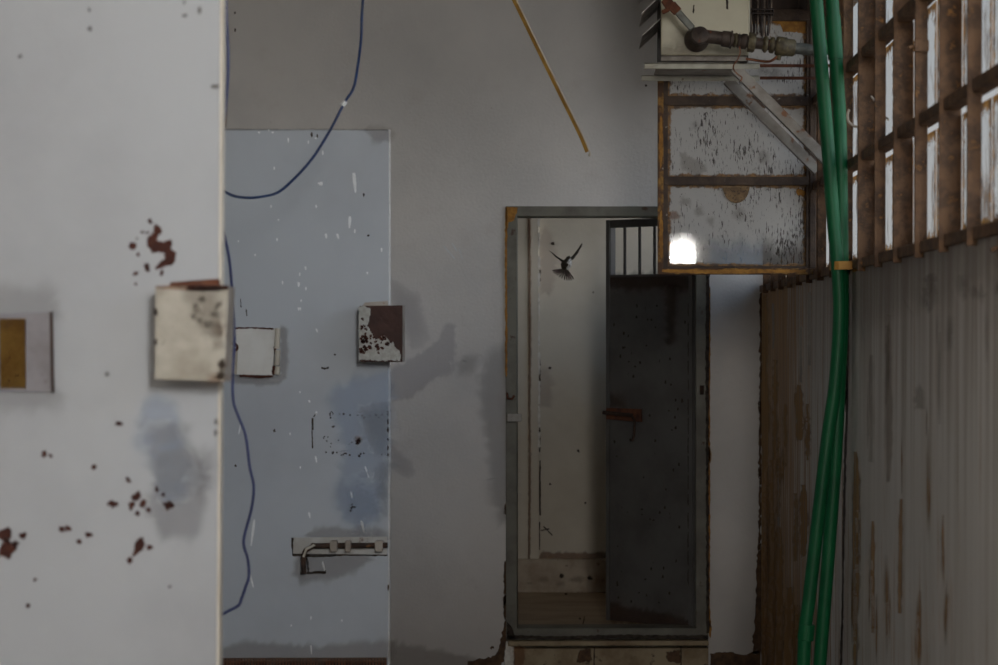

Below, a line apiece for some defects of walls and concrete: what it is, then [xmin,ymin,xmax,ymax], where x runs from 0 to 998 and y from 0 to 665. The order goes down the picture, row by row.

rust [129,218,176,285]
rust [107,477,151,516]
rust [0,527,27,559]
rust [59,526,93,544]
rust [126,537,153,564]